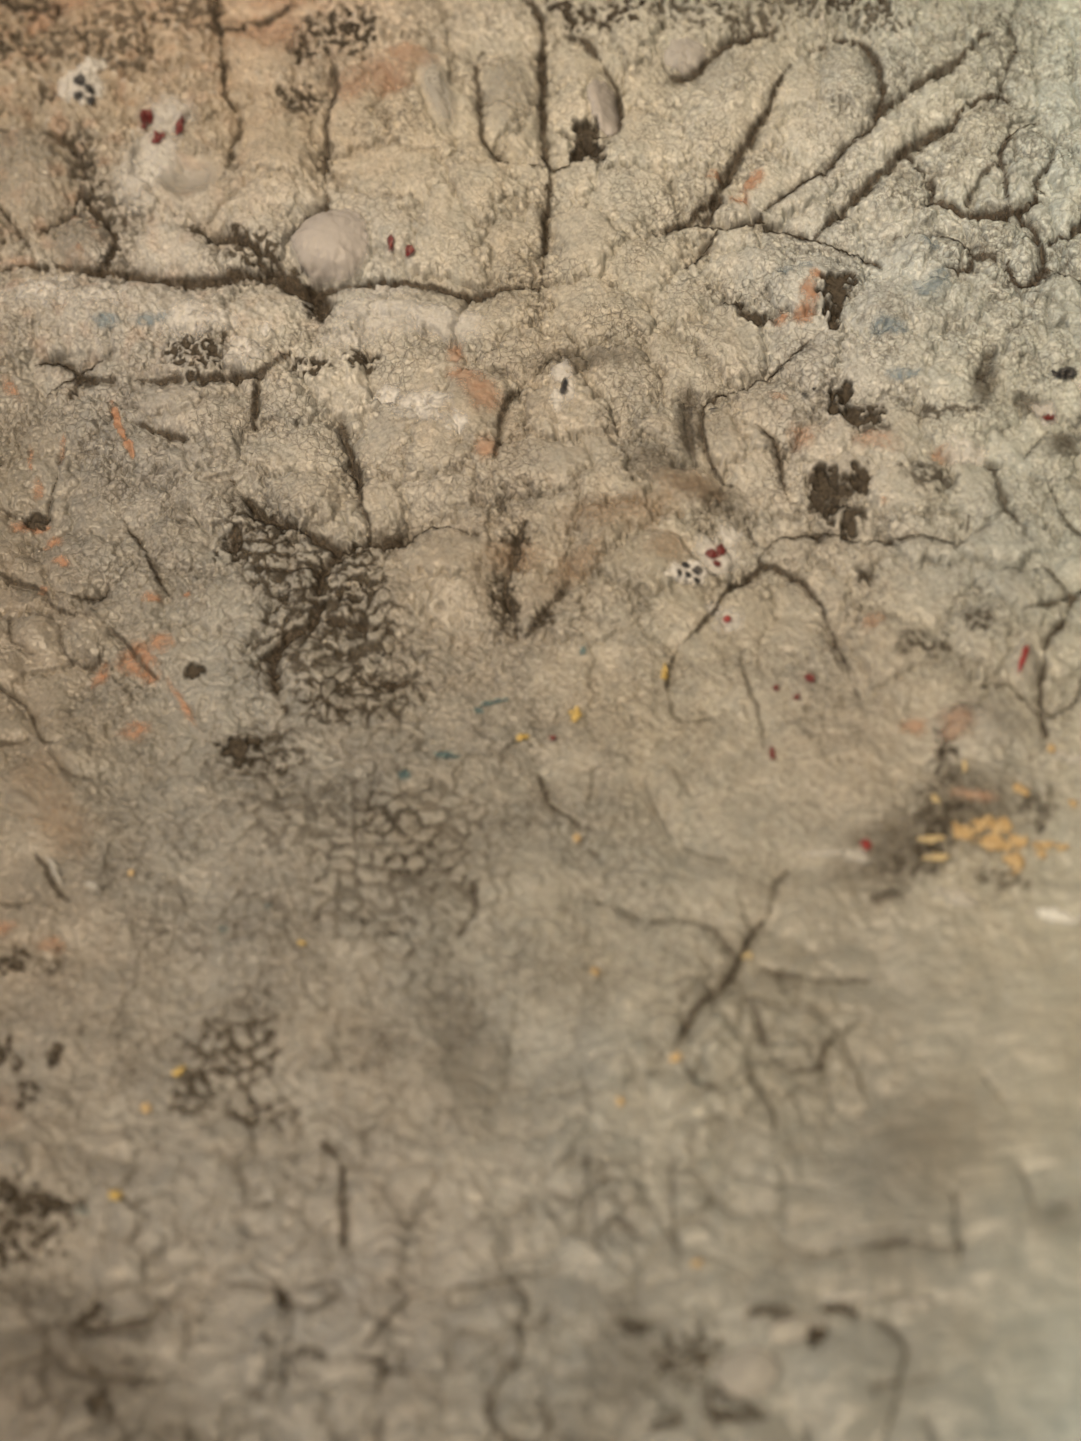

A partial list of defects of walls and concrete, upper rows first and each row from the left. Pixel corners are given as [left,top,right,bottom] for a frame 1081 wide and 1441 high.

crack [0,0,623,322]
crack [662,17,1081,289]
crack [38,350,290,431]
crack [699,333,820,496]
spalling [827,379,886,429]
spalling [808,460,871,541]
crack [227,422,479,714]
crack [665,515,969,722]
spalling [0,944,31,975]
spalling [0,1035,40,1110]
spalling [46,1041,63,1068]
spalling [0,1174,71,1214]